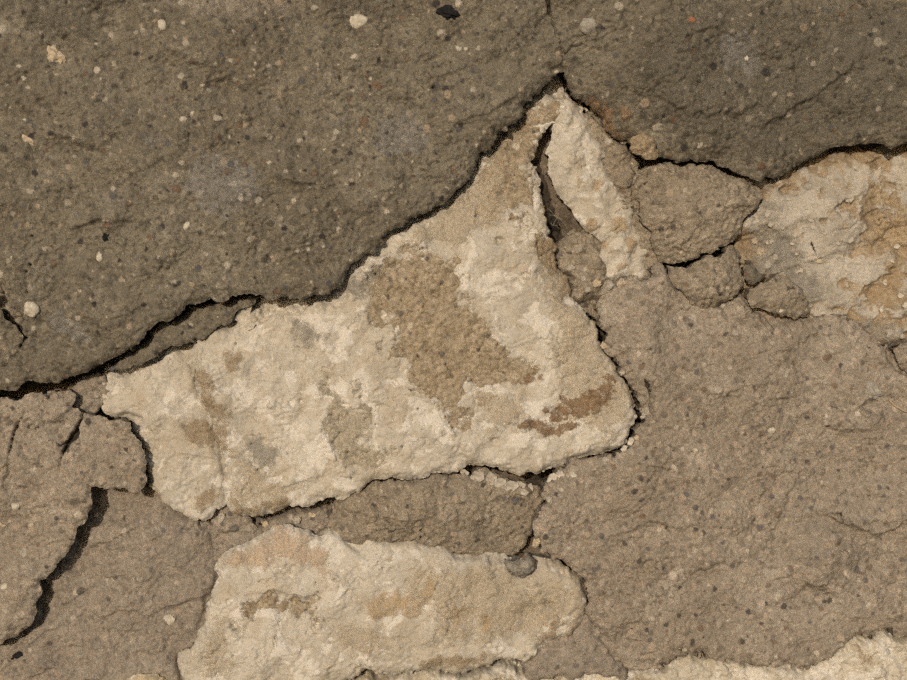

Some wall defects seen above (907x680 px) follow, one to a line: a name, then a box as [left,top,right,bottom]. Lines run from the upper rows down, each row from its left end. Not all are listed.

spalling [476,101,561,223]
crack [530,155,563,243]
crack [662,242,731,275]
crack [63,419,82,454]
spalling [318,373,397,476]
spalling [363,247,539,431]
crack [585,313,651,450]
crack [361,473,441,491]
peeling [460,469,533,496]
crack [523,468,553,502]
spalling [0,471,258,680]
spalling [243,590,321,627]